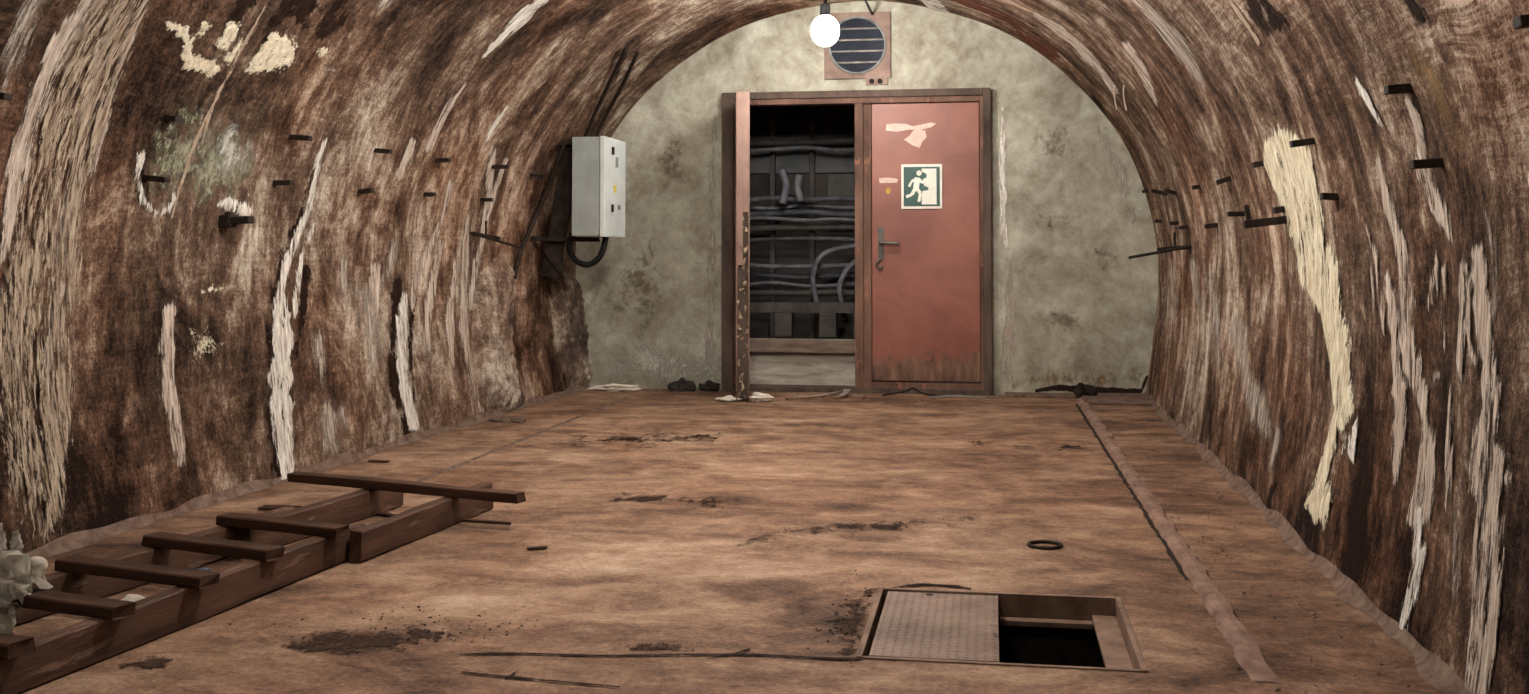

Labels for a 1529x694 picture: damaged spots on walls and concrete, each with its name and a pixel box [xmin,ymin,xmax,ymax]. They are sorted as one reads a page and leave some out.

peeling [165,20,300,79]